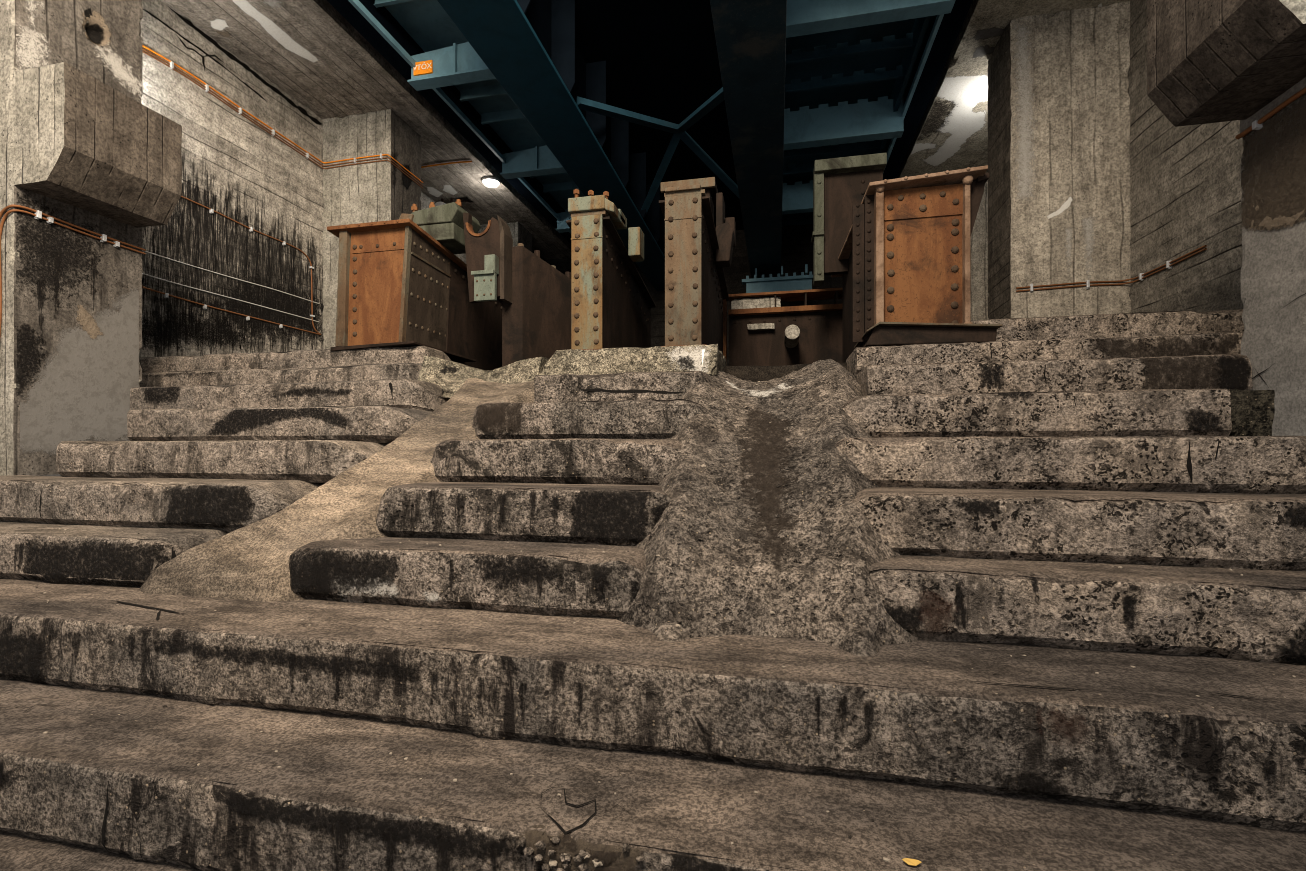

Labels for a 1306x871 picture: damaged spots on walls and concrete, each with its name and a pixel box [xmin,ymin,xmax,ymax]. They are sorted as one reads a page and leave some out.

spalling [1241,95,1306,232]
water stain [15,188,104,399]
water stain [140,154,324,404]
water stain [0,624,52,685]
water stain [69,631,80,685]
water stain [151,638,438,706]
water stain [477,678,485,715]
water stain [519,682,527,724]
water stain [225,794,551,871]
crack [541,787,629,834]
water stain [671,853,759,871]